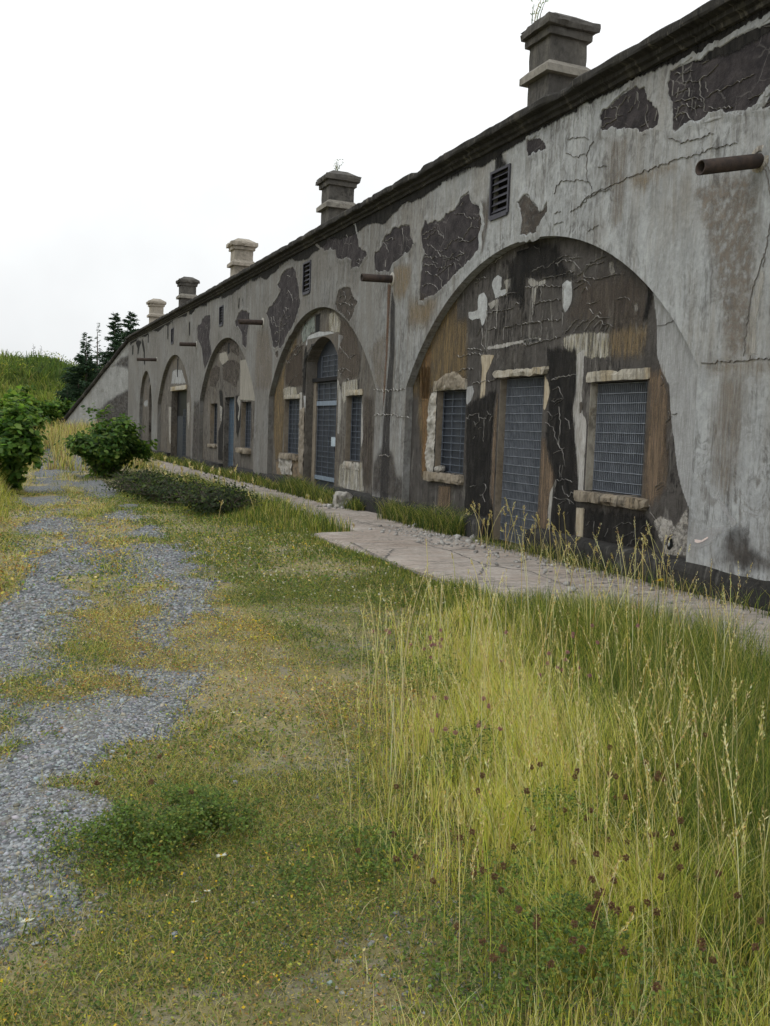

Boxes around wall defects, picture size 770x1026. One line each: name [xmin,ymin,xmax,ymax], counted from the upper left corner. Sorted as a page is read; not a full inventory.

spalling [197,306,251,387]
spalling [266,263,302,363]
spalling [315,185,485,327]
crack [346,202,630,384]
spalling [515,186,552,242]
crack [553,60,770,231]
spalling [595,12,770,142]
crack [701,224,770,364]